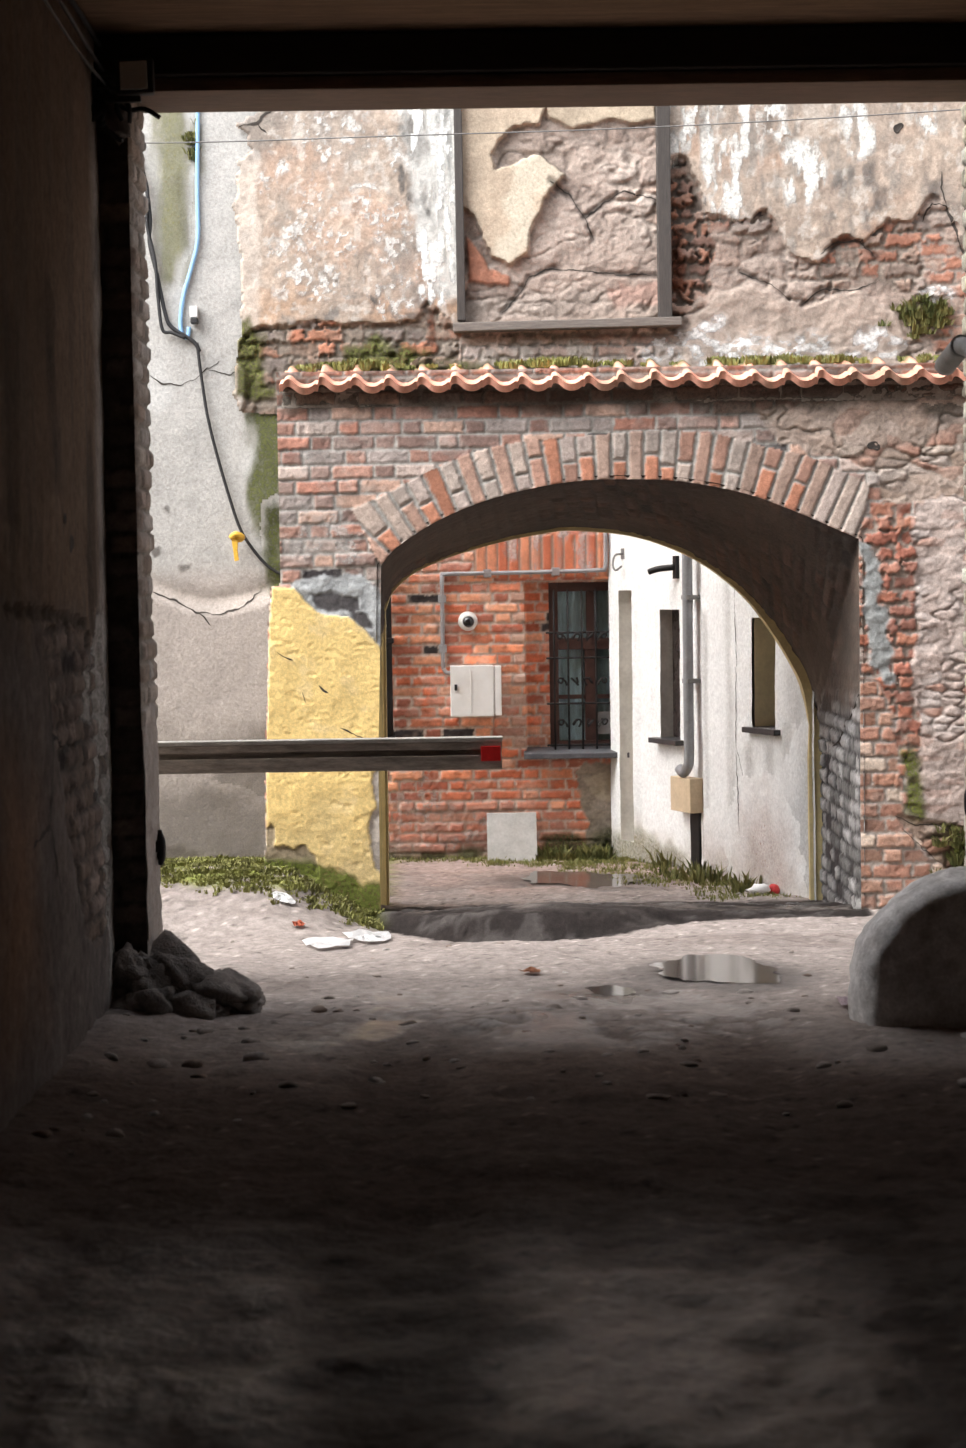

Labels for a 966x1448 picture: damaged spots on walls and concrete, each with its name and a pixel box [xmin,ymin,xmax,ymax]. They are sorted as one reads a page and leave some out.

flaking render [243,103,966,414]
leakage [246,413,281,586]
crack [154,591,261,626]